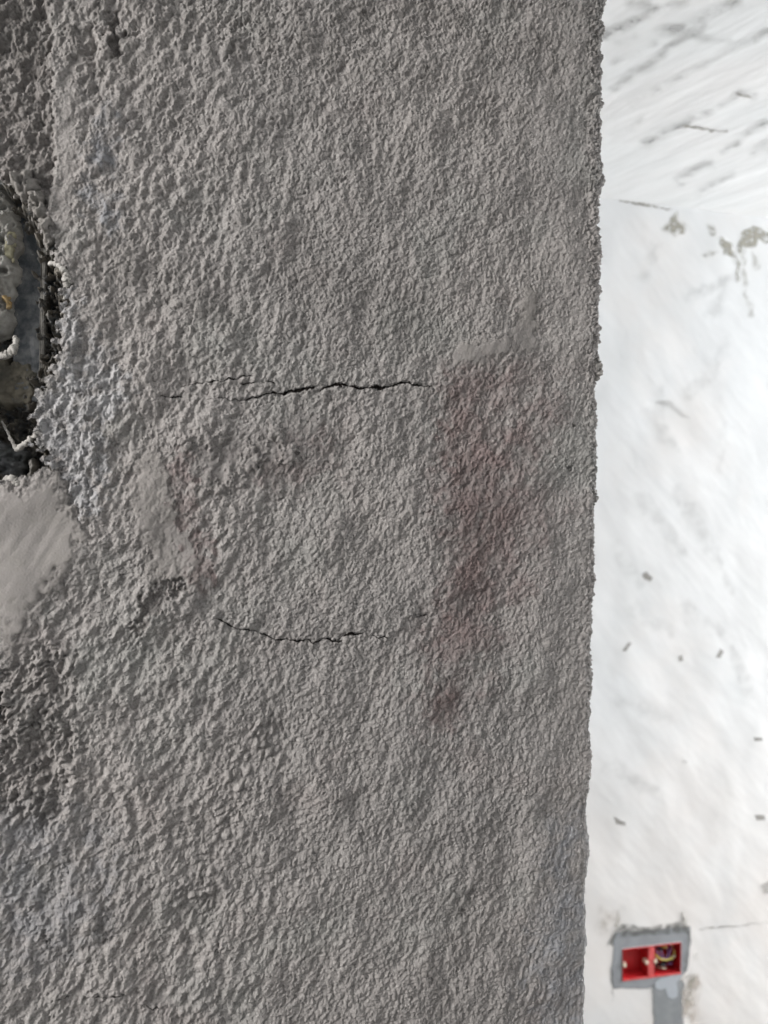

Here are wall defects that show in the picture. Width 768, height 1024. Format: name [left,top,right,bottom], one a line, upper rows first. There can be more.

spalling [0,178,74,487]
crack [161,375,432,402]
crack [216,618,388,644]